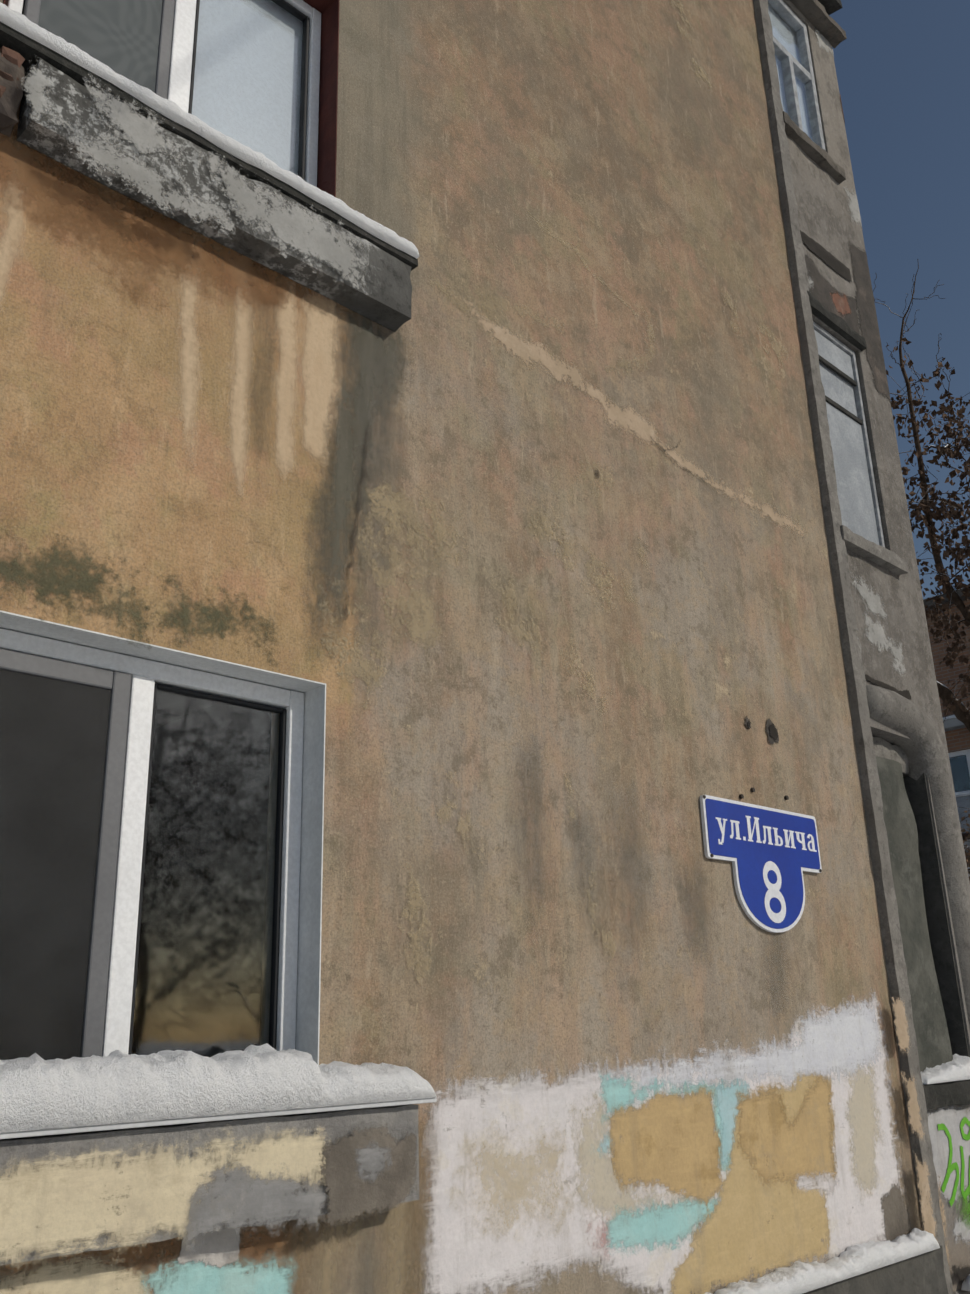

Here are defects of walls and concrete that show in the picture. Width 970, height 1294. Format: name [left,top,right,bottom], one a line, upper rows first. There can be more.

damp [0,181,24,300]
peeling [0,46,369,294]
damp [180,270,200,433]
damp [230,284,404,626]
crack [447,284,806,538]
mould [0,544,148,638]
mould [163,579,270,643]